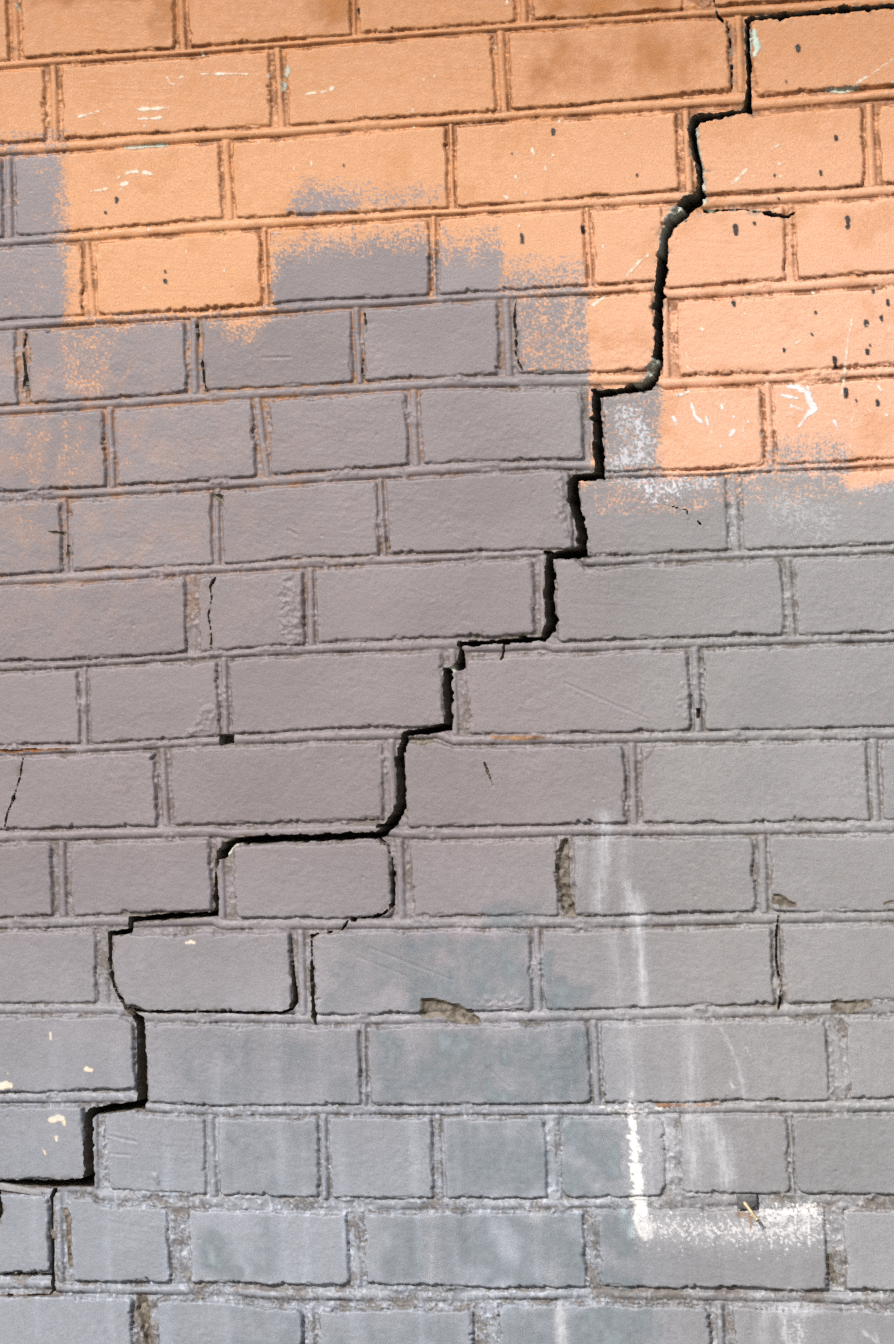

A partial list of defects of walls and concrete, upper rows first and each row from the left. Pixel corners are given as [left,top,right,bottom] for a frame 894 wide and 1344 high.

crack [22,333,30,398]
crack [108,0,894,972]
crack [4,755,26,828]
crack [310,933,319,1025]
crack [774,915,782,1010]
crack [0,945,298,1232]
crack [0,1237,56,1297]